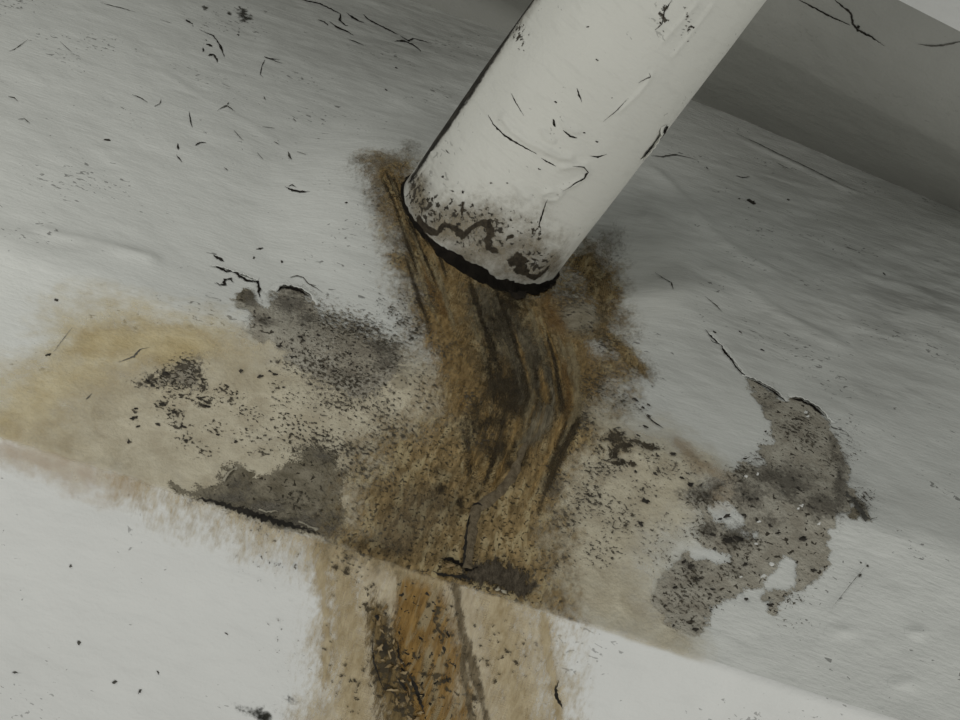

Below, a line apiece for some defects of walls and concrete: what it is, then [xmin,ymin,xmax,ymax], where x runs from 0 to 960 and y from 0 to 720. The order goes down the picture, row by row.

crack [800,0,884,46]
crack [488,115,604,187]
water stain [0,313,453,550]
crack [212,255,261,303]
peeling [126,190,504,547]
rust [228,147,647,720]
water stain [524,398,711,652]
peeling [433,279,879,637]
crack [705,329,749,377]